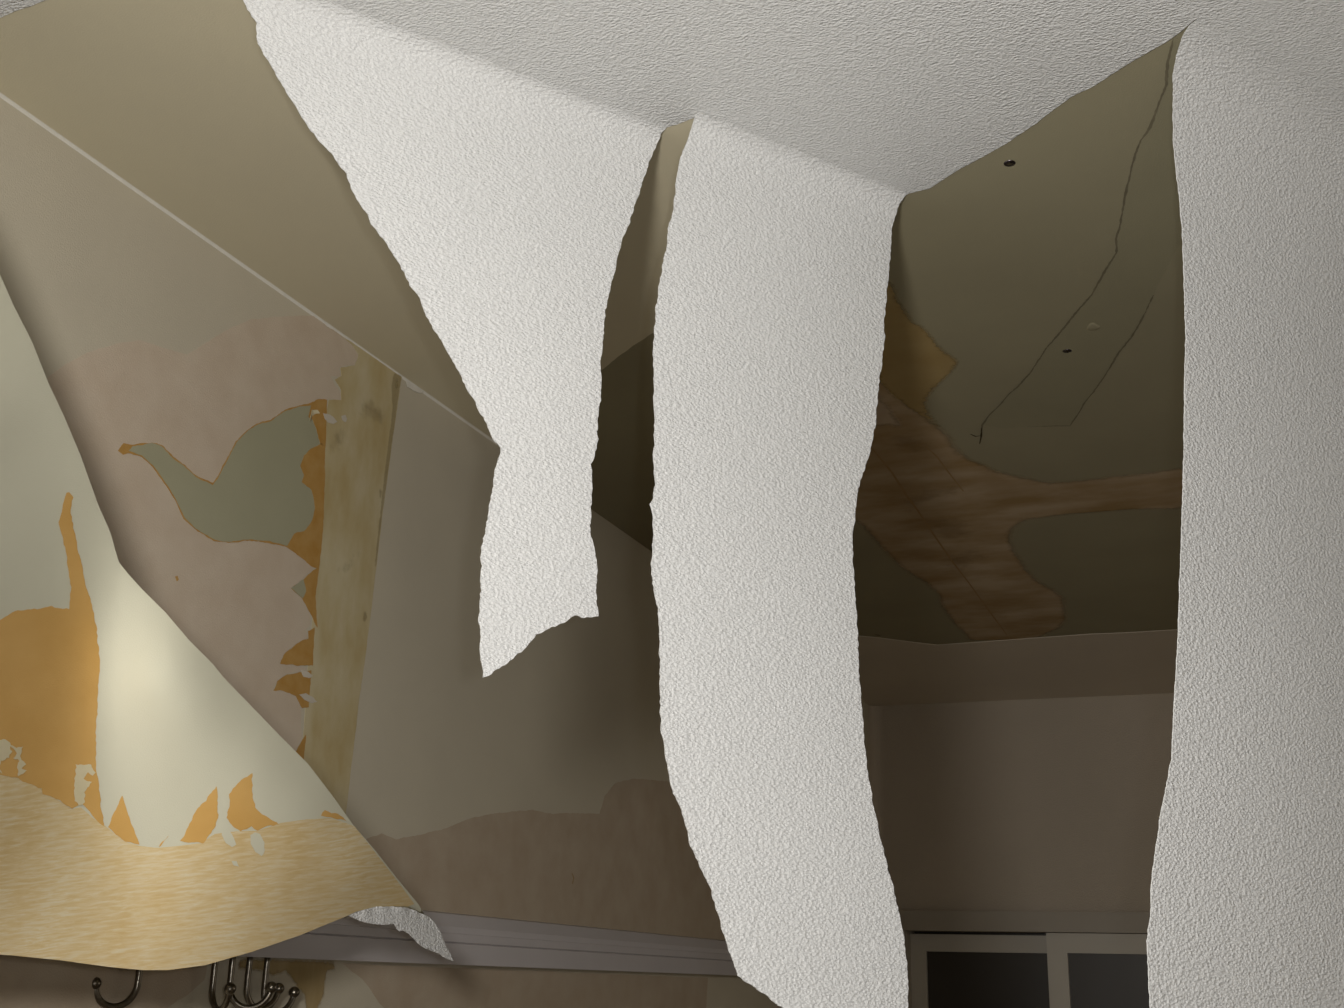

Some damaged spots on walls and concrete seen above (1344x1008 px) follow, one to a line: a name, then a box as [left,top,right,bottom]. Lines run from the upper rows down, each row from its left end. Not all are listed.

peeling [0,113,909,1008]
peeling [243,0,667,677]
crack [970,37,1174,444]
peeling [1146,18,1344,1008]